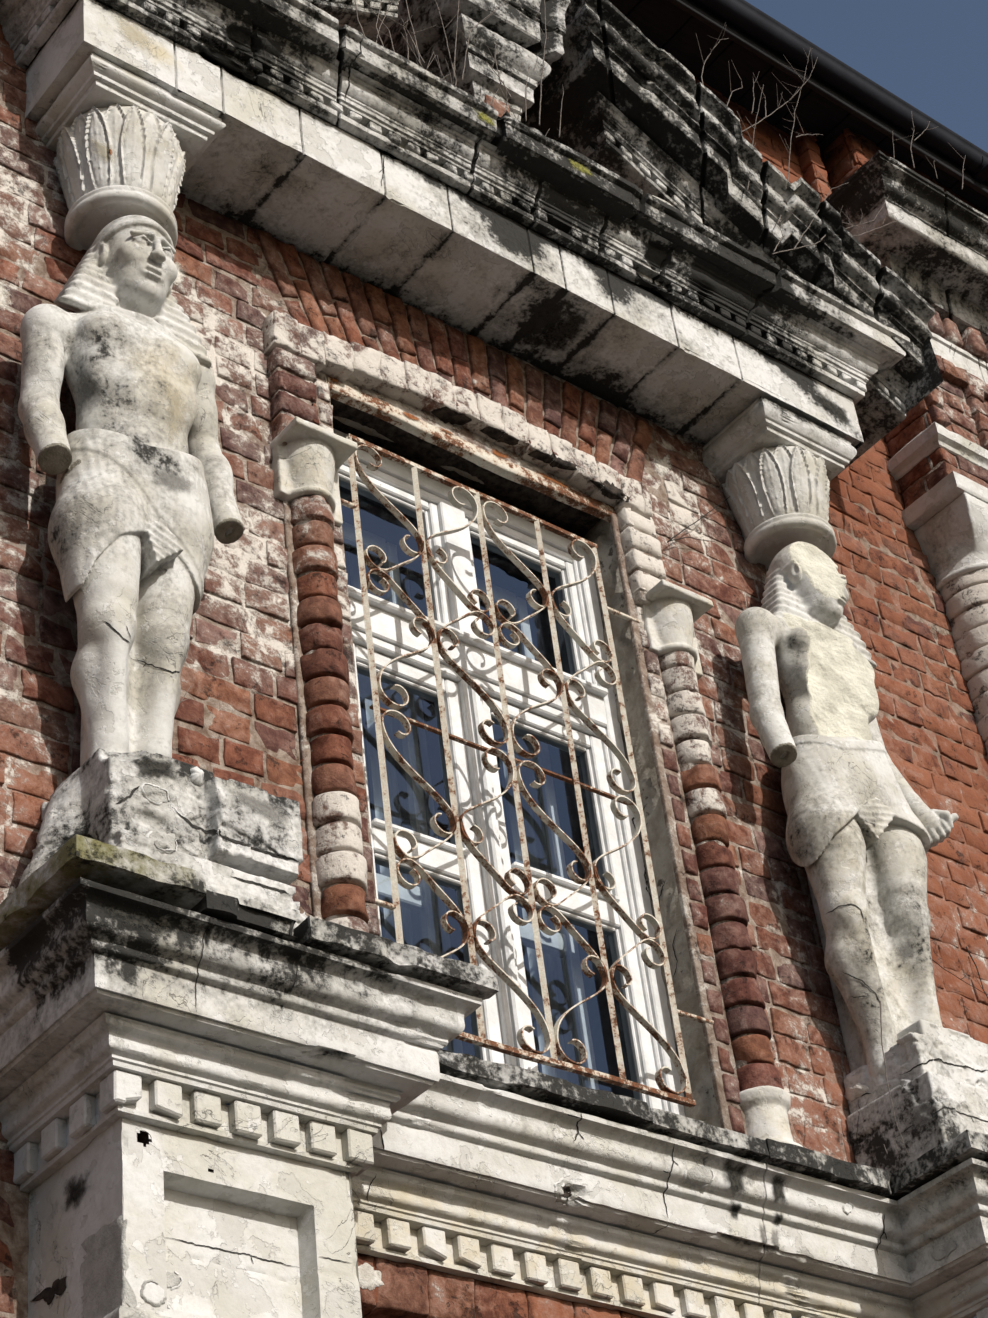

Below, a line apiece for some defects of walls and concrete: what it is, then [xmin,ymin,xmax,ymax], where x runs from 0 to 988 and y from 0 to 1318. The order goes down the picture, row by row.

water stain [569,159,592,175]
water stain [536,312,586,350]
crack [116,786,139,804]
water stain [105,906,169,933]
crack [900,1058,988,1075]
crack [653,1143,678,1234]
water stain [725,1158,745,1218]
water stain [760,1175,786,1250]
flaking render [30,1215,183,1318]
crack [166,1237,349,1268]